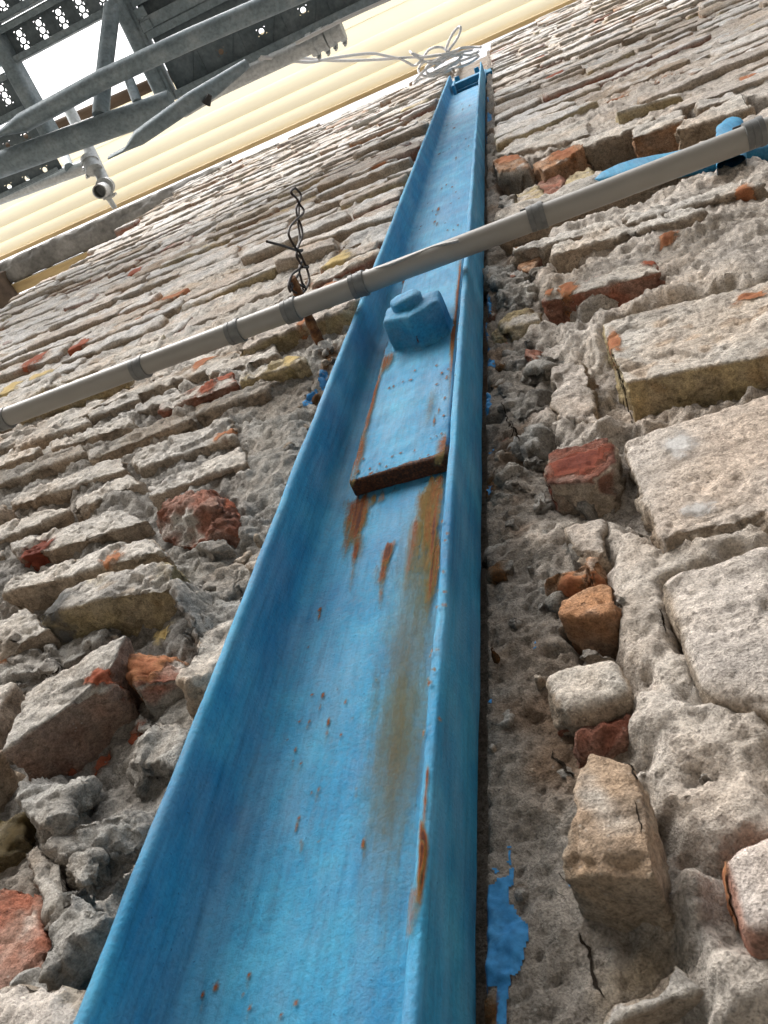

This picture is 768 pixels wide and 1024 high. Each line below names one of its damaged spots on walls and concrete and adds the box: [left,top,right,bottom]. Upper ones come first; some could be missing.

rust [352,263,461,482]
crack [607,340,637,428]
rust [344,493,384,573]
rust [378,540,395,600]
rust [406,475,448,608]
crack [628,763,643,833]
rust [409,767,429,931]
crack [579,933,606,999]